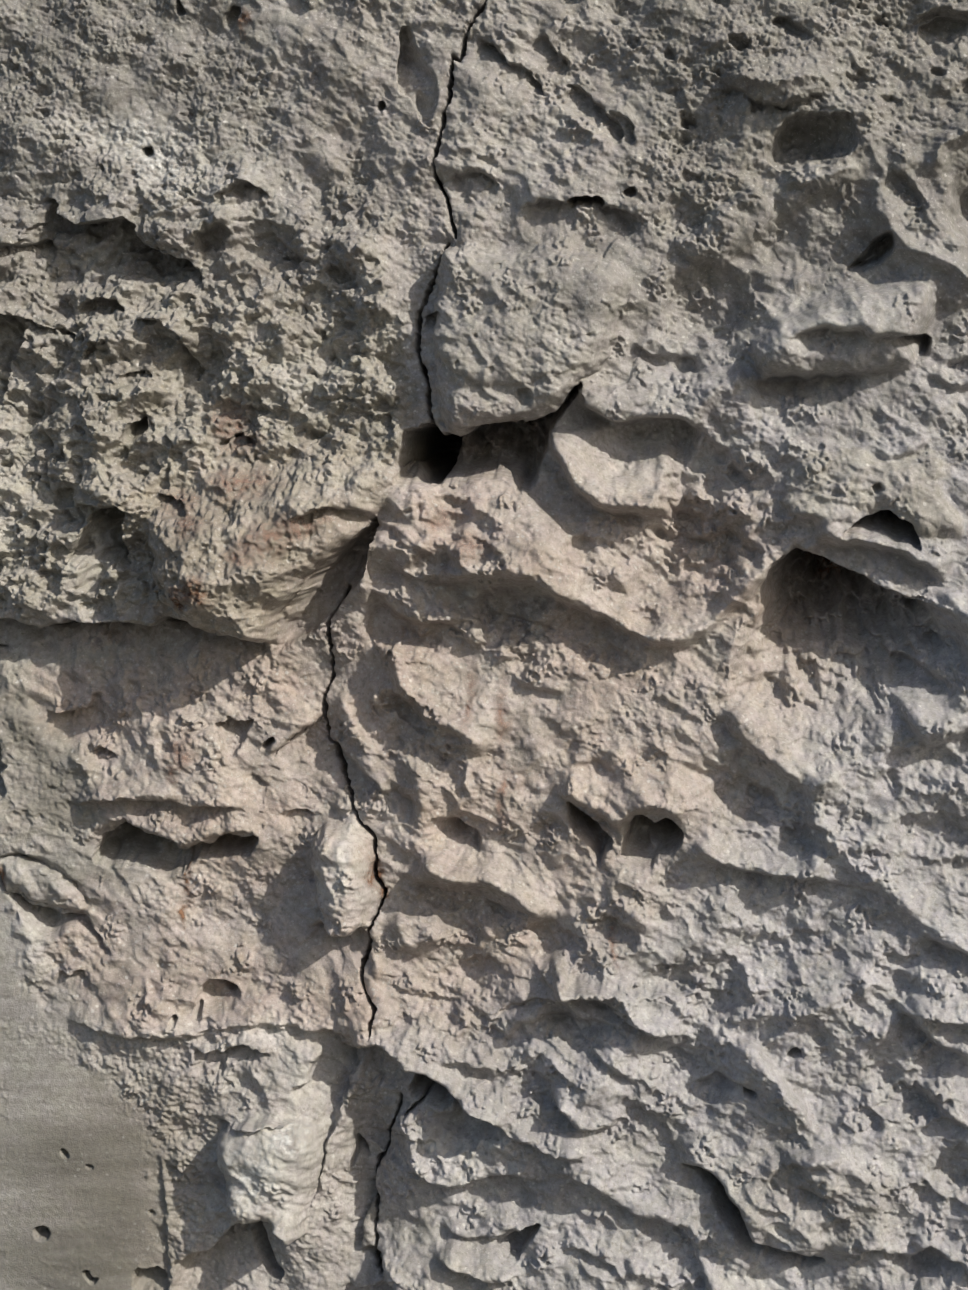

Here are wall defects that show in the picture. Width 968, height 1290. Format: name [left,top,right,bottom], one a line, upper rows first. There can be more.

crack [415,7,485,427]
crack [274,589,388,1041]
crack [373,1080,435,1275]